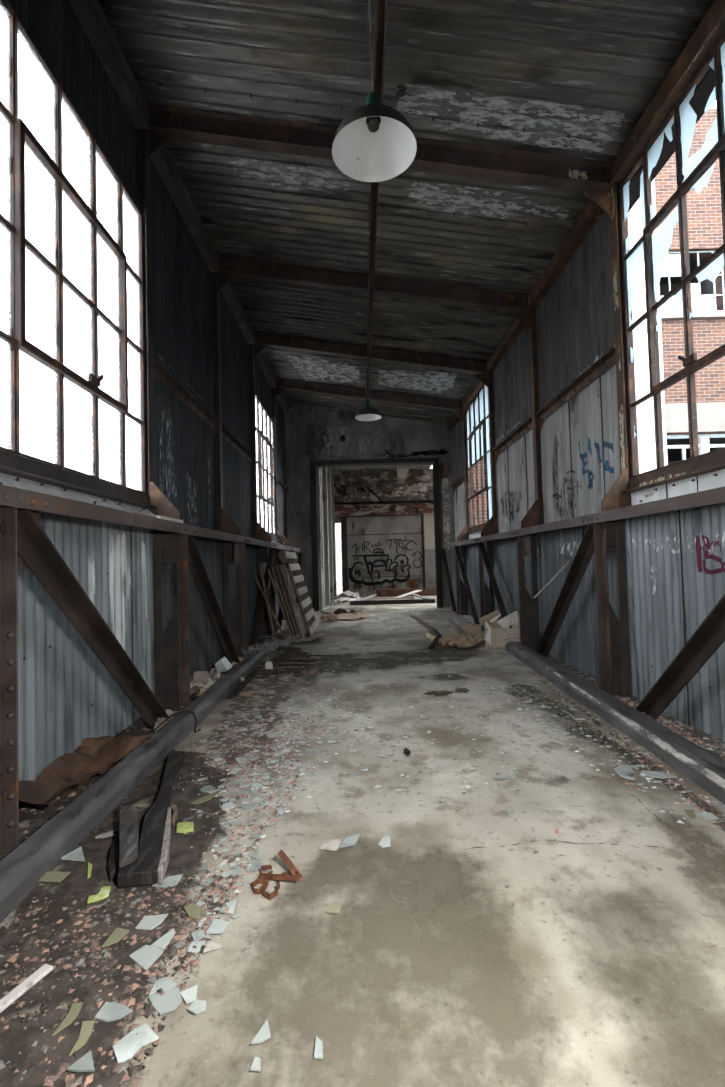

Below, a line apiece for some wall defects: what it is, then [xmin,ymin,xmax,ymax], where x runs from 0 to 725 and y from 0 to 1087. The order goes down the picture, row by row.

peeling [395,83,625,155]
peeling [223,152,351,193]
peeling [406,182,570,228]
crack [463,794,669,850]